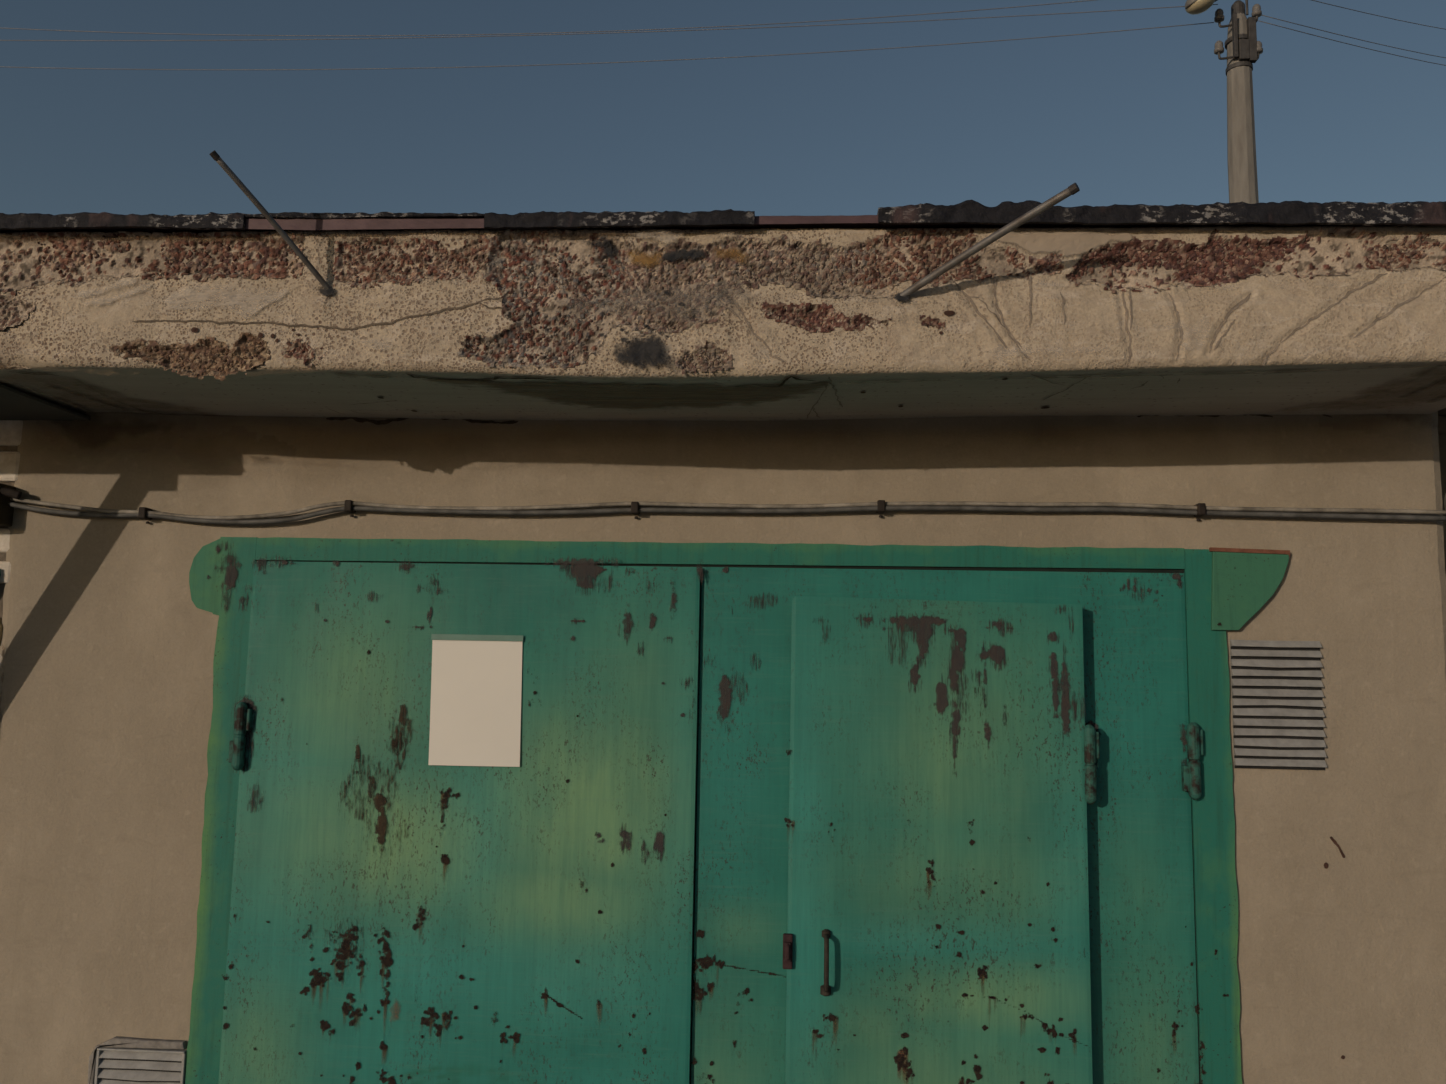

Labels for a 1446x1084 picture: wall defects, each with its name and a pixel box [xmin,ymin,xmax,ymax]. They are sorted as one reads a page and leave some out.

spalling [0,231,306,330]
spalling [109,327,325,381]
crack [132,297,540,330]
water stain [429,379,829,409]
water stain [599,325,671,368]
spalling [331,226,1446,374]
crack [954,271,1251,417]
crack [1262,273,1445,365]
corrosion [860,615,1013,776]
corrosion [340,704,412,859]
corrosion [299,919,393,1035]
corrosion [691,954,786,1008]